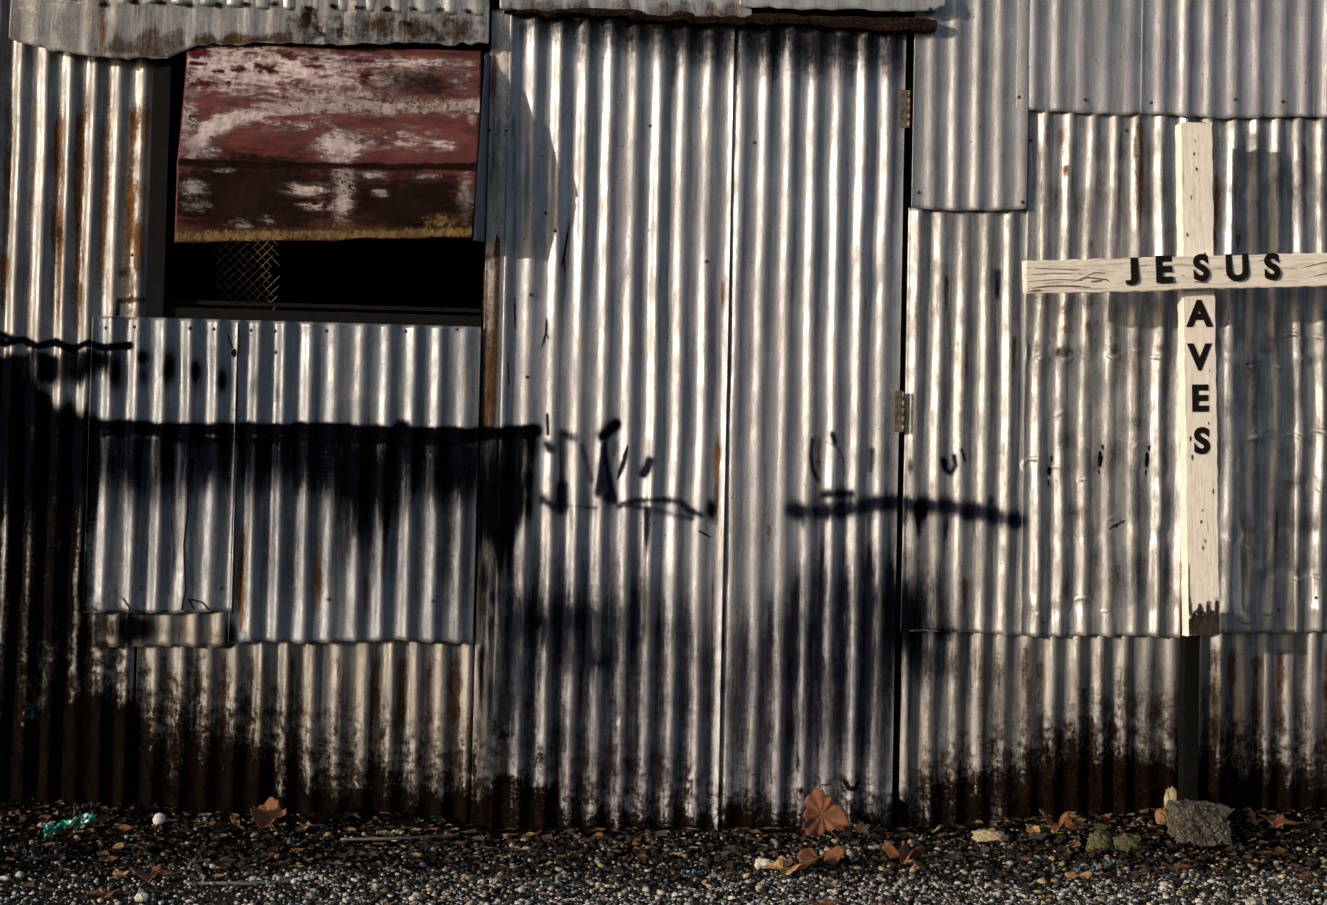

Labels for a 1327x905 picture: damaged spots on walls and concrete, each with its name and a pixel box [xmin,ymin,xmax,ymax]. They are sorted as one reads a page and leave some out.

rust [1,84,13,305]
rust [51,92,110,330]
rust [113,104,150,318]
rust [96,0,485,61]
rust [176,148,477,242]
peeling [180,45,480,221]
rust [385,72,452,112]
rust [0,591,1179,832]
rust [1198,678,1327,813]